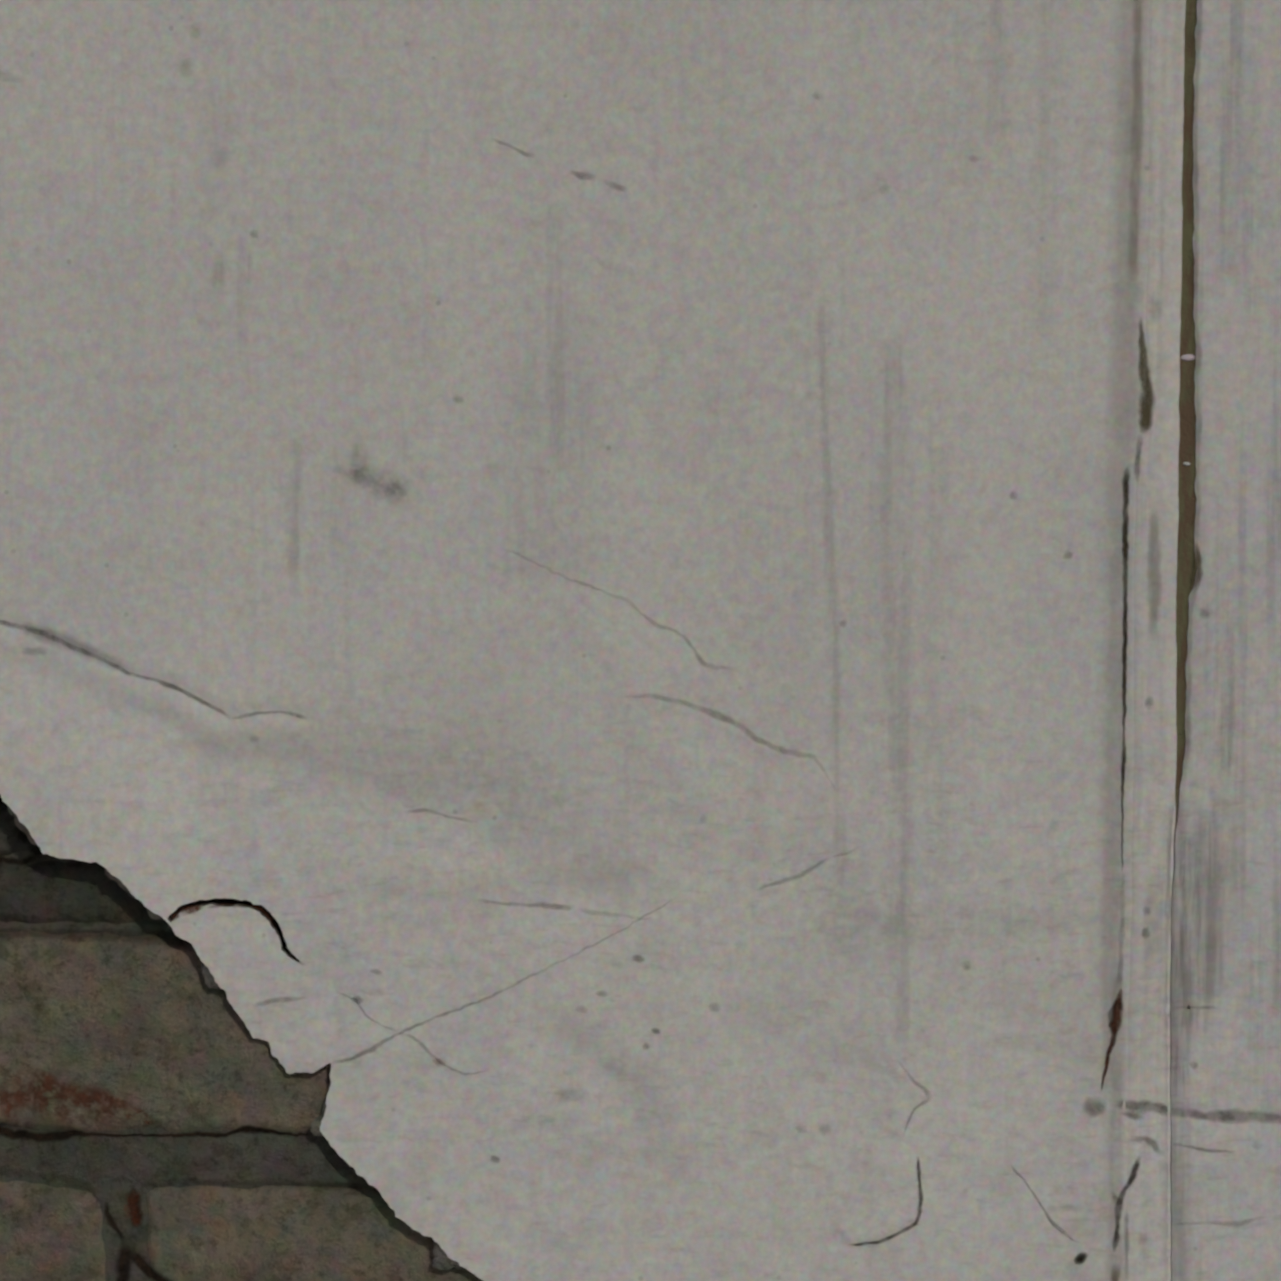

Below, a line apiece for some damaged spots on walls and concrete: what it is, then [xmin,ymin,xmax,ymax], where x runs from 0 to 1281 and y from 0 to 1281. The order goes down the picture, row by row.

crack [165,898,300,962]
spalling [0,795,483,1281]
crack [1192,1112,1235,1121]